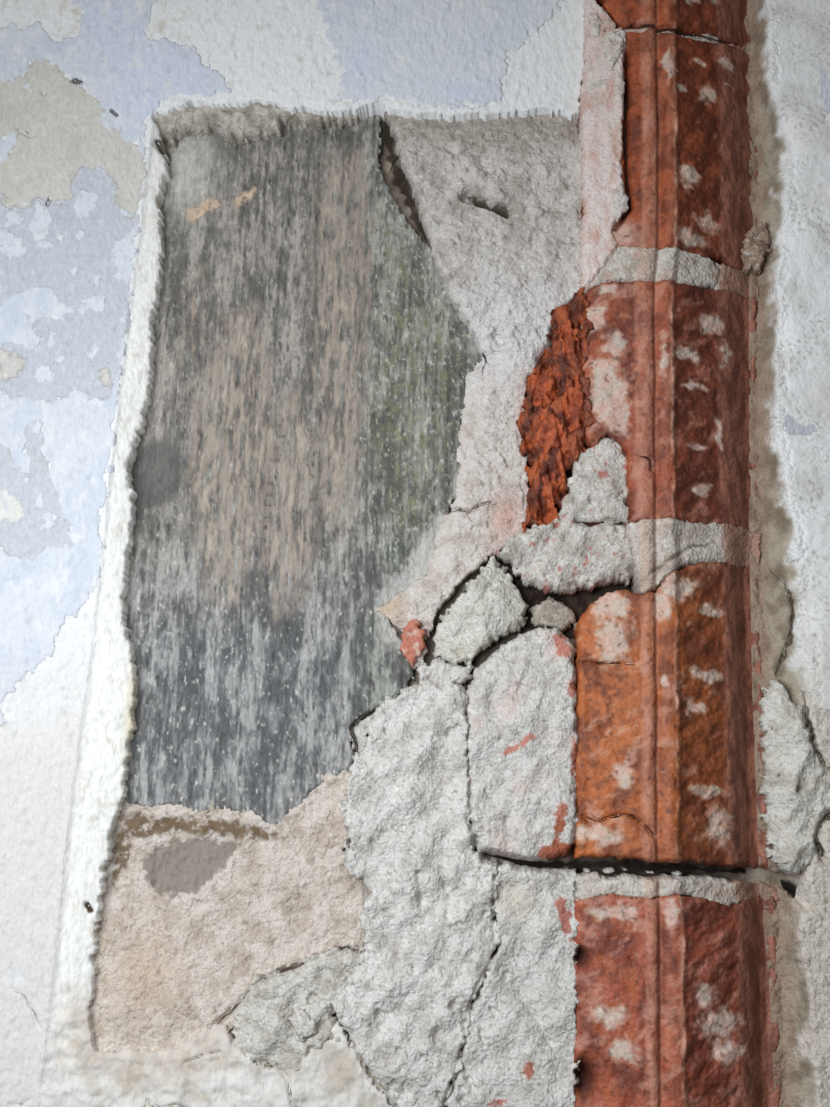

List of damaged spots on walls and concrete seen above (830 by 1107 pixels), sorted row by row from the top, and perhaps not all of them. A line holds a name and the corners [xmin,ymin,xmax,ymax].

spalling [741,222,774,276]
crack [577,520,625,528]
peeling [0,0,633,1107]
crack [643,544,705,581]
crack [772,572,795,673]
crack [349,709,376,764]
crack [584,814,655,836]
crack [486,854,746,875]
crack [780,879,797,899]